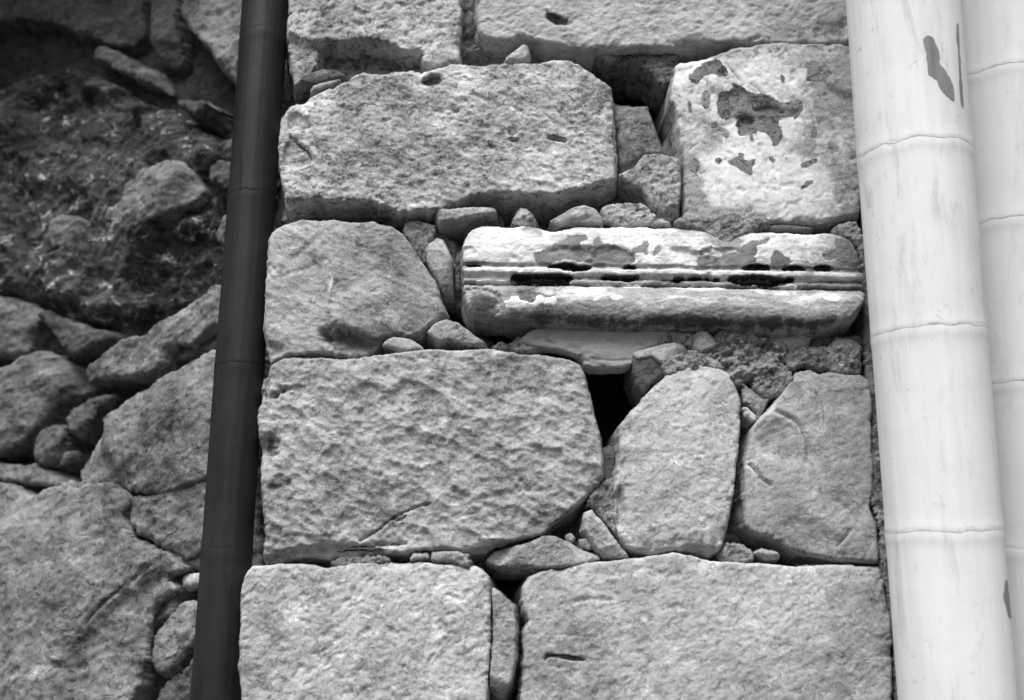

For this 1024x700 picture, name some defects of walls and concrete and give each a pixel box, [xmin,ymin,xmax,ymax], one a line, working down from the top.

peeling [805,60,831,81]
peeling [923,23,964,107]
peeling [687,59,803,162]
peeling [688,158,700,172]
peeling [715,153,756,175]
peeling [504,235,661,311]
peeling [664,237,859,302]
crack [338,503,430,553]